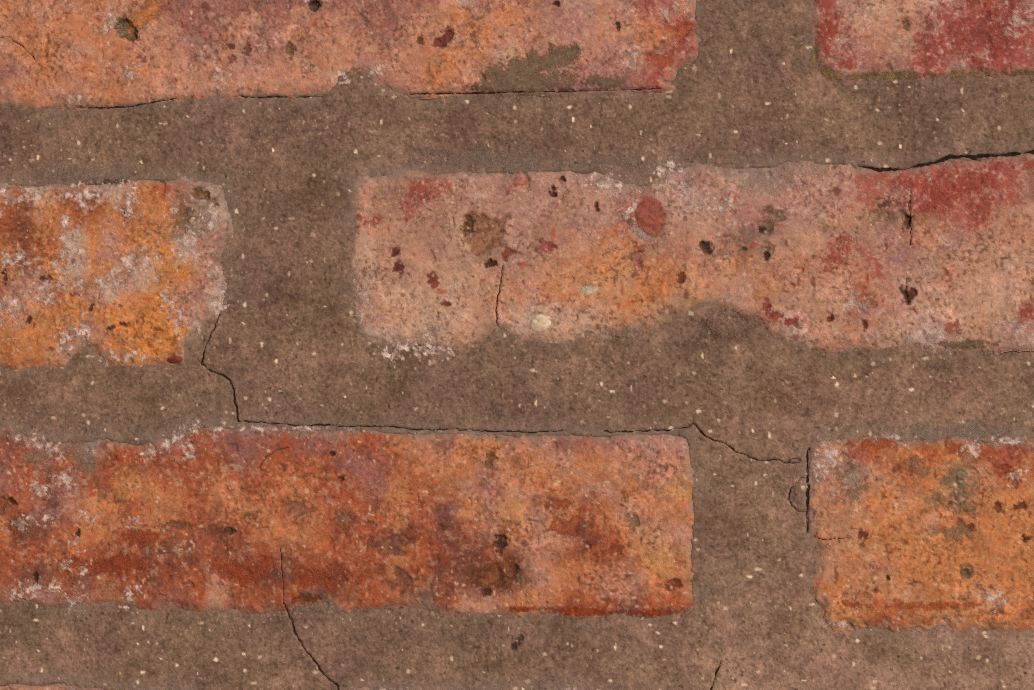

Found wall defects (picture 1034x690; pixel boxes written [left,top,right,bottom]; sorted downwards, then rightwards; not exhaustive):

crack [858,150,1034,172]
crack [201,315,562,468]
crack [604,423,848,540]
crack [280,548,344,686]